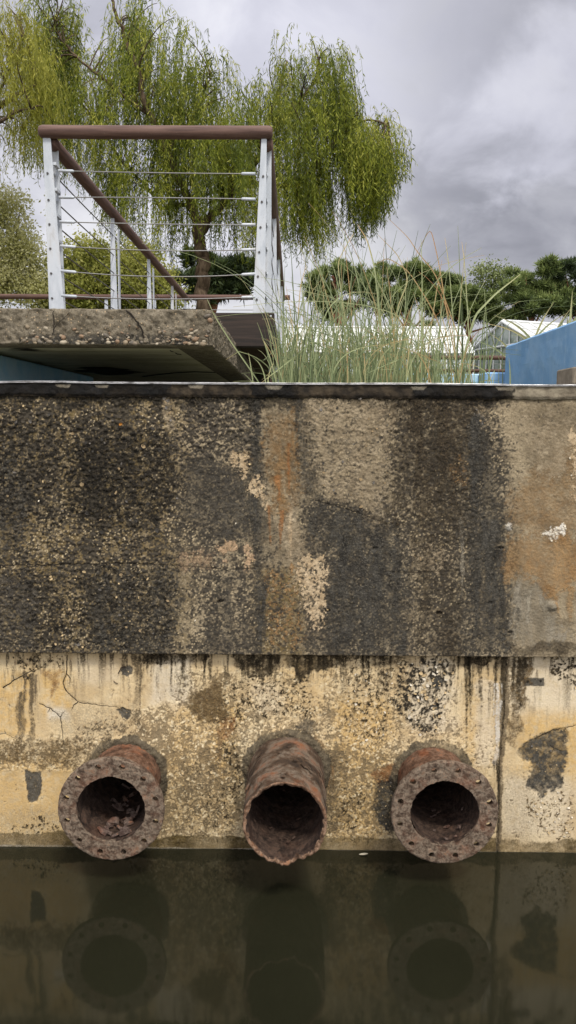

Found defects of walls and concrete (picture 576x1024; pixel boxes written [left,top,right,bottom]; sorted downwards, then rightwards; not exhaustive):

damp [0,383,202,408]
rust [260,407,303,538]
damp [0,672,86,768]
crack [3,655,119,744]
damp [91,567,228,722]
damp [177,385,576,852]